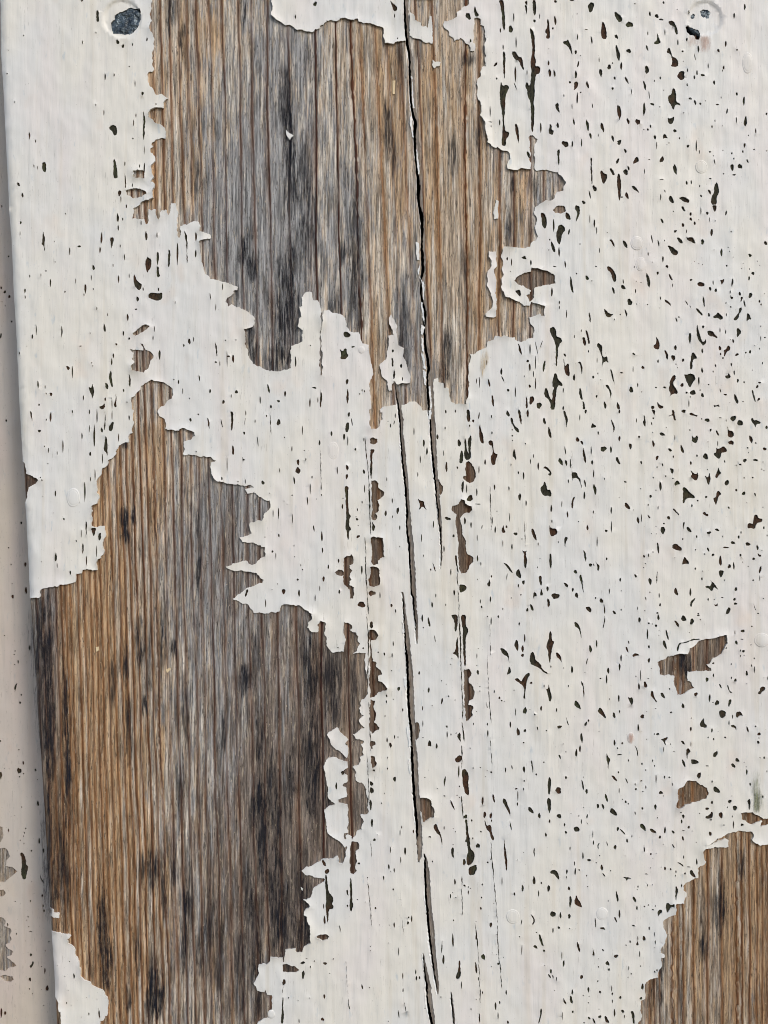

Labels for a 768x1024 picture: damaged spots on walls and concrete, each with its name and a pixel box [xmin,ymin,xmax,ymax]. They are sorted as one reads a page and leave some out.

peeling [12,325,387,1024]
peeling [126,0,582,592]
crack [395,0,525,1024]
peeling [658,635,727,695]
peeling [631,799,768,1024]